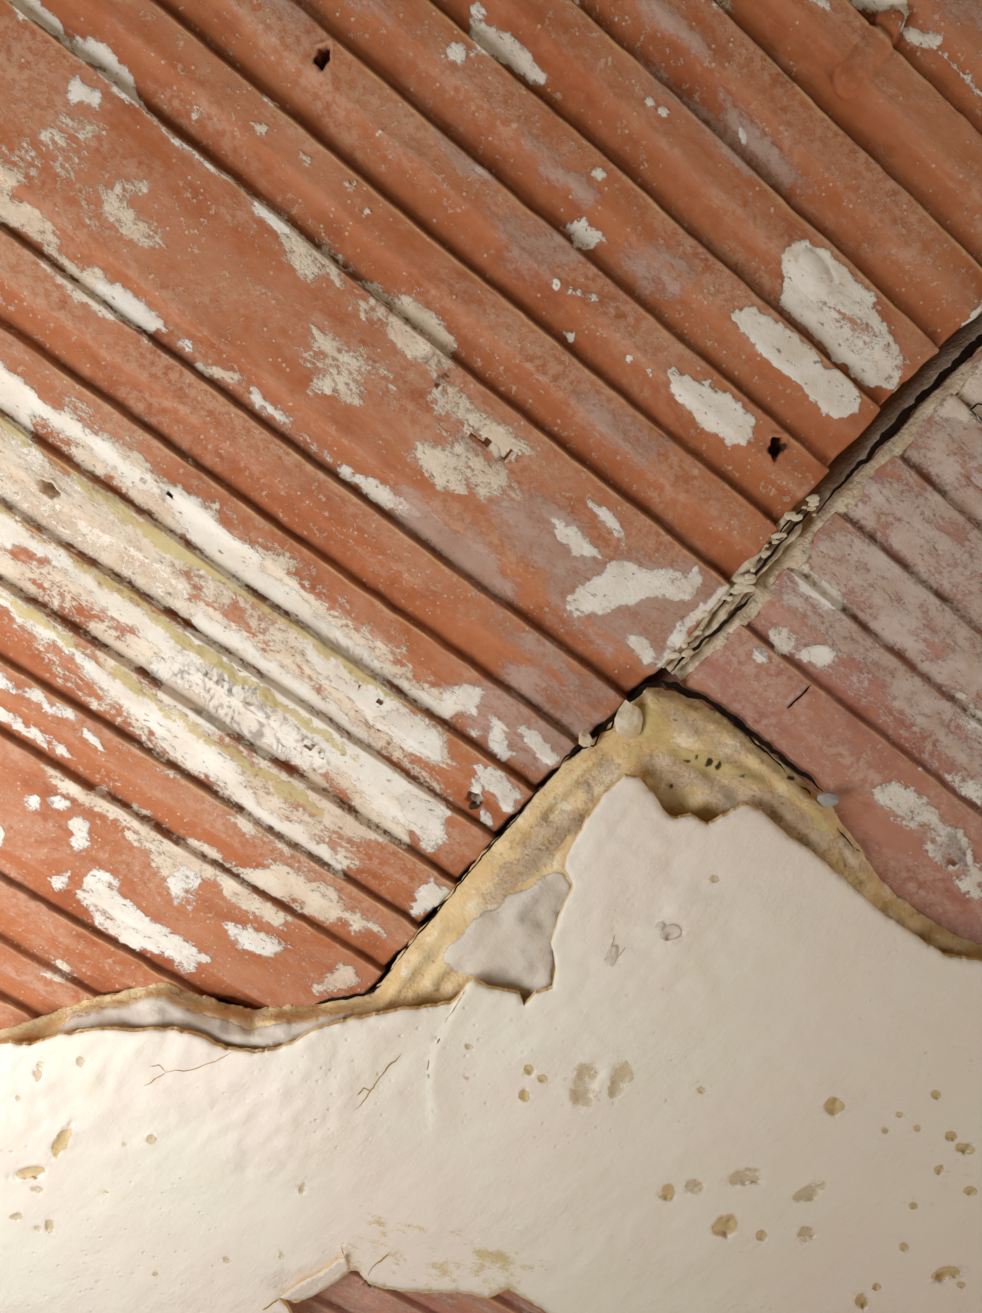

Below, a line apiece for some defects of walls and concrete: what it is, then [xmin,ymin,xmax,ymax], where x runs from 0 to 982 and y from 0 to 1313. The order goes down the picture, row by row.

peeling [900,21,944,50]
peeling [562,217,606,250]
peeling [91,277,193,352]
peeling [249,386,293,427]
peeling [307,437,421,519]
crack [316,334,982,1004]
peeling [454,684,563,826]
peeling [639,705,870,873]
peeling [443,755,619,1003]
peeling [57,993,352,1050]
spalling [52,1130,71,1157]
peeling [280,1254,548,1313]